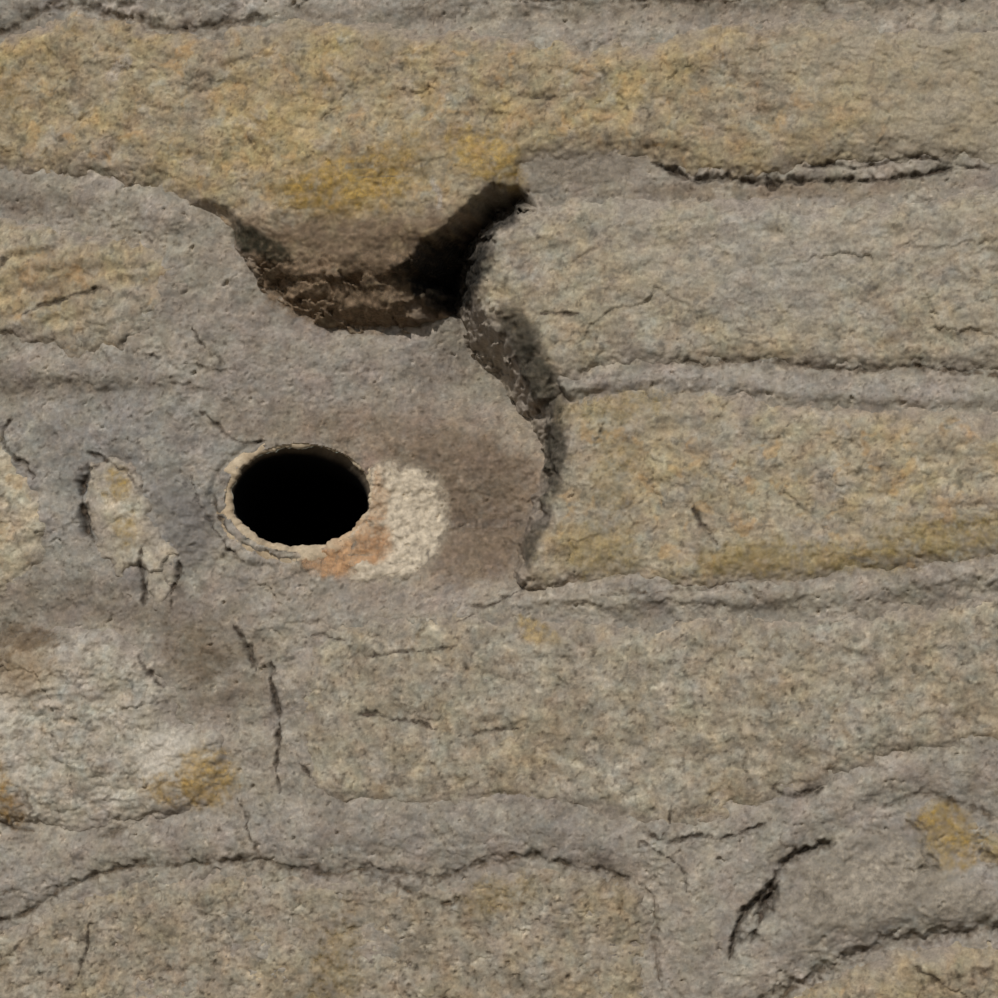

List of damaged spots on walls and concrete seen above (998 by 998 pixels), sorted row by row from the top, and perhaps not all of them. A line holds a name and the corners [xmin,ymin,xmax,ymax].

damp [394,200,524,316]
damp [543,408,566,494]
crack [233,625,310,782]
crack [729,842,834,959]